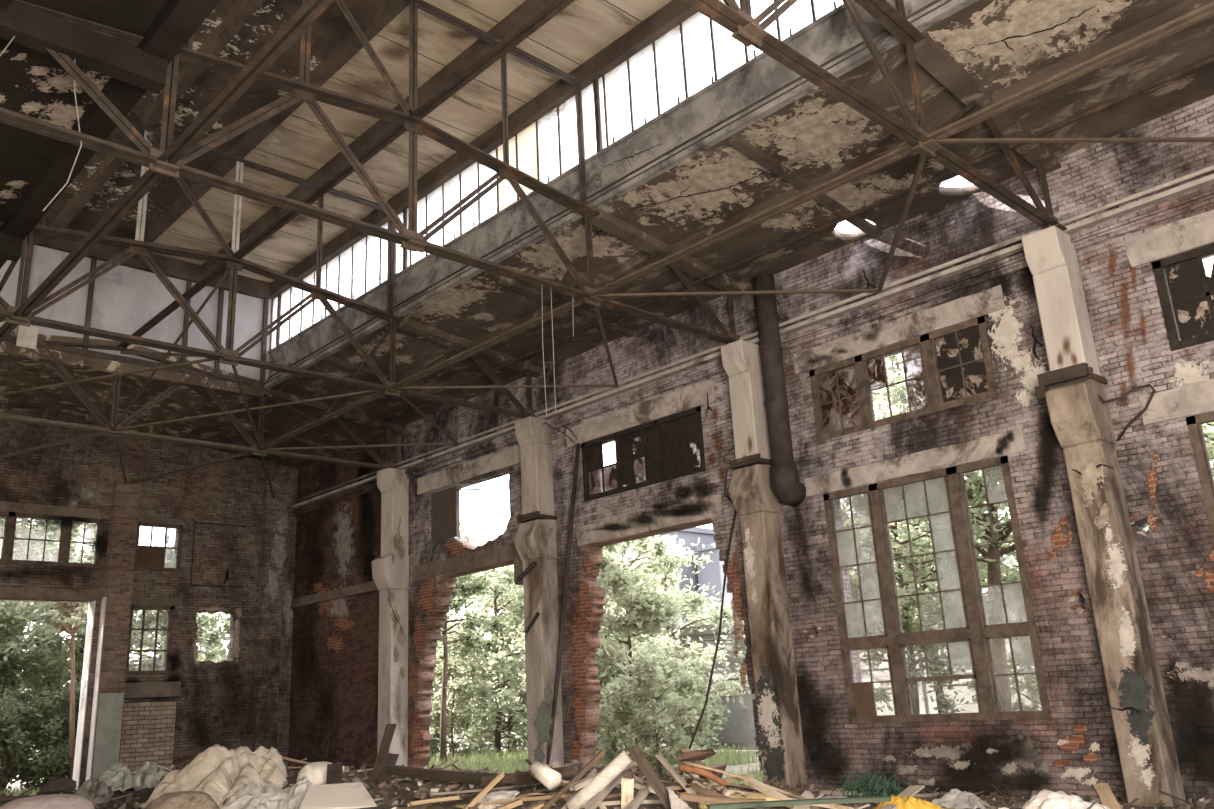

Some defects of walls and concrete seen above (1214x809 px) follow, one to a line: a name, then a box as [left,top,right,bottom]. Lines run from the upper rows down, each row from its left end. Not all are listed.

crack [957,6,1095,52]
peeling [928,0,1132,92]
peeling [0,49,110,129]
peeling [595,86,896,235]
peeling [760,158,947,232]
peeling [988,287,1048,407]
damp [1041,412,1055,457]
damp [675,487,692,500]
damp [1034,485,1048,523]
peeling [724,527,786,786]
peeling [1080,446,1157,789]
damp [1146,737,1157,773]